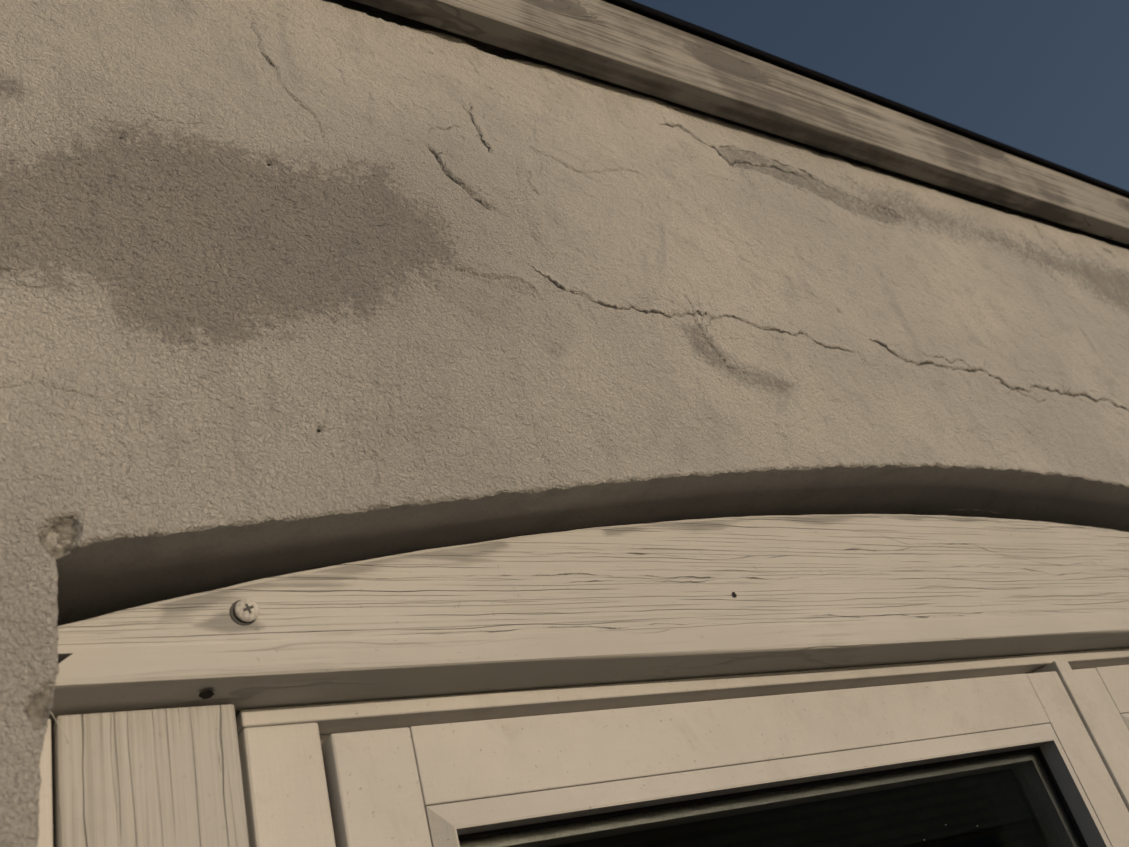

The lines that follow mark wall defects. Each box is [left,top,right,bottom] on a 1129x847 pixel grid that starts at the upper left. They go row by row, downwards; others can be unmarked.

crack [429,107,493,211]
crack [657,119,802,183]
crack [528,264,1129,411]